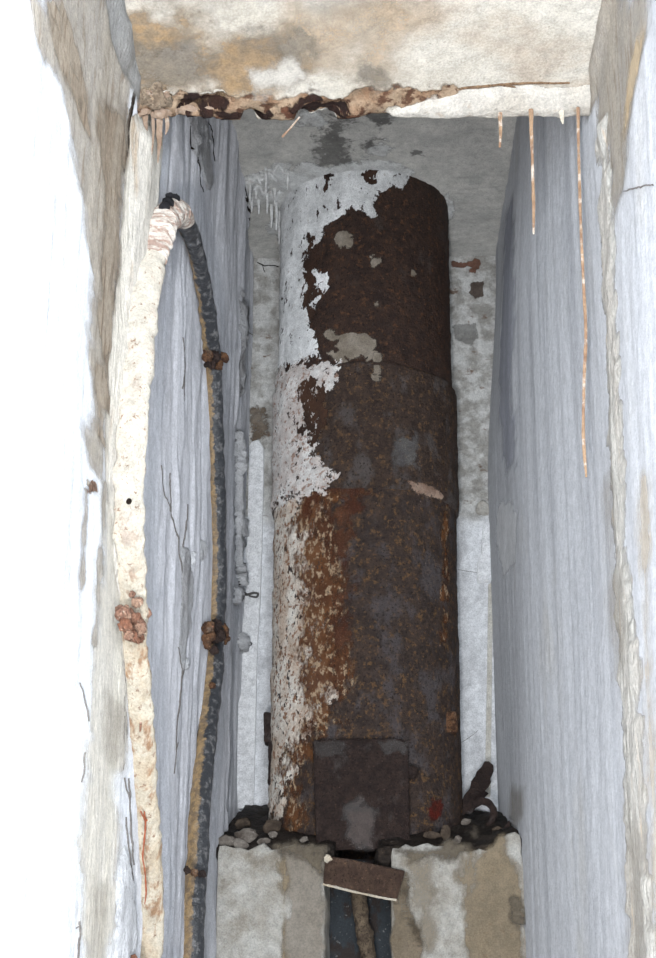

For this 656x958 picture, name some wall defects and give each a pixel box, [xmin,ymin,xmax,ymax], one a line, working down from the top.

leakage [250,59,306,92]
crack [422,82,570,92]
spalling [137,84,459,190]
corrosion [361,170,379,185]
corrosion [298,232,326,327]
corrosion [451,258,481,273]
corrosion [294,375,330,447]
leakage [244,110,415,820]
leakage [367,0,656,958]
corrosion [277,488,371,832]
corrosion [342,796,377,850]
leakage [274,842,326,958]